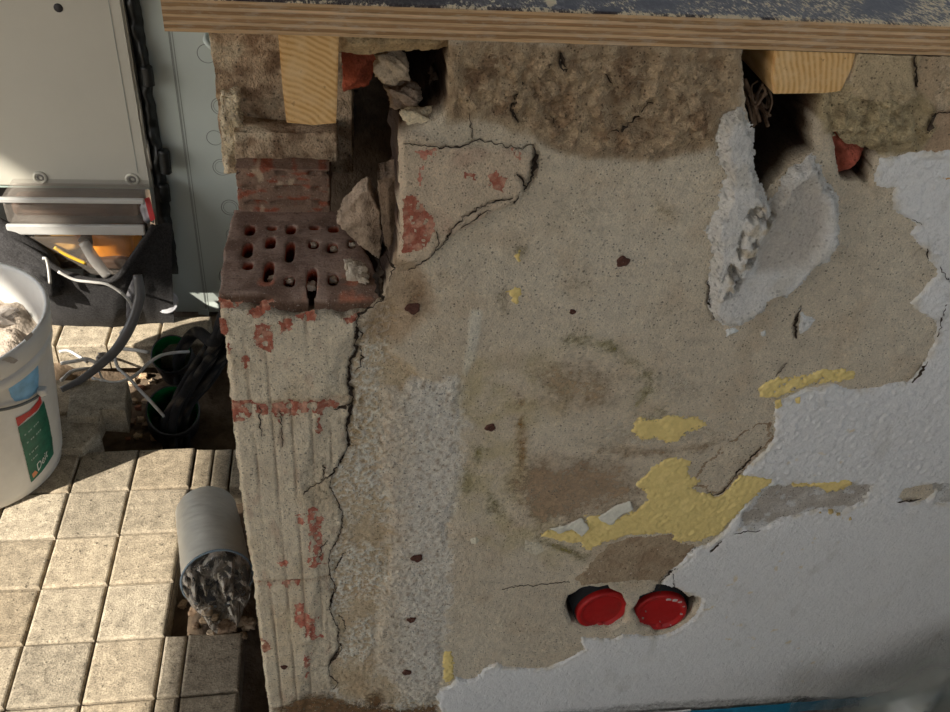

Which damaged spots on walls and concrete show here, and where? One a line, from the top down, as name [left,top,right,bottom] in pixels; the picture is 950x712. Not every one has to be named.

crack [510,82,523,122]
spalling [457,52,736,159]
crack [612,102,652,132]
spalling [828,95,920,172]
spalling [799,309,815,334]
crack [304,114,539,690]
peeling [758,368,855,409]
peeling [631,415,707,443]
peeling [524,422,870,586]
peeling [442,651,455,684]